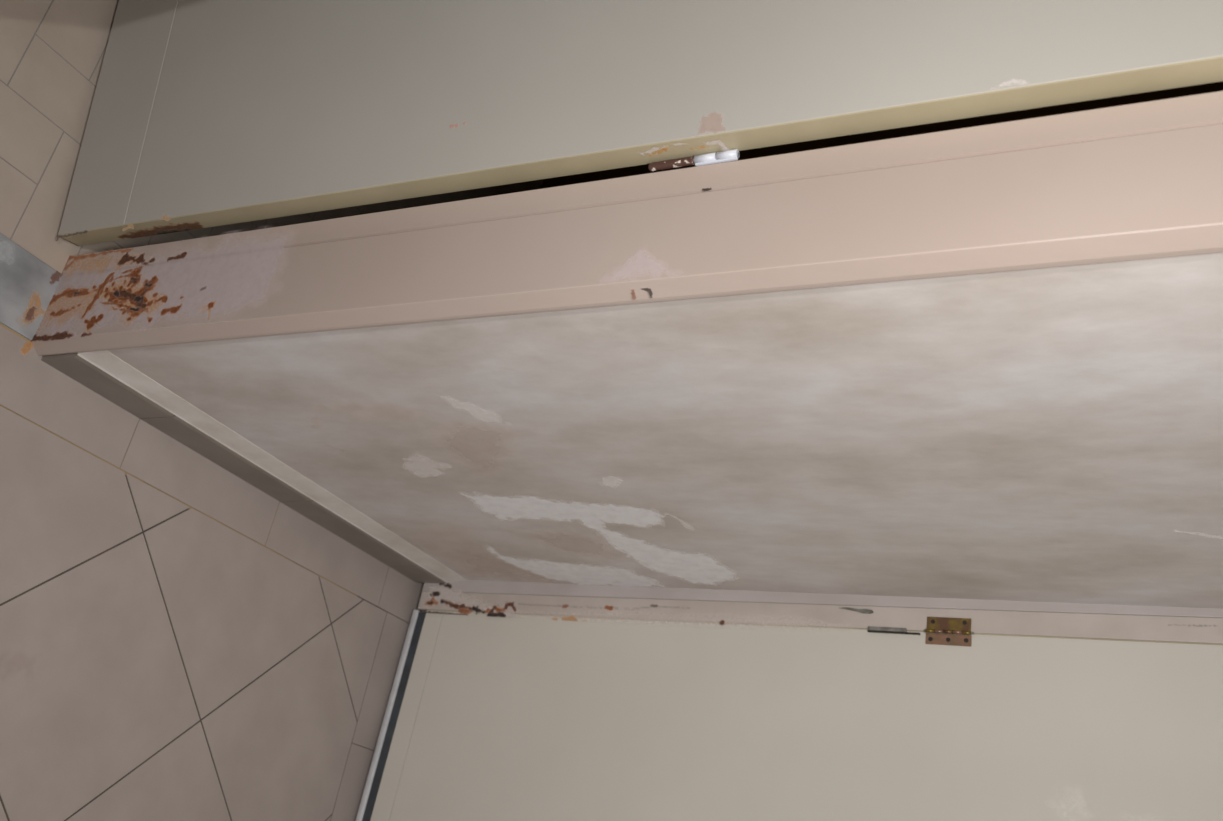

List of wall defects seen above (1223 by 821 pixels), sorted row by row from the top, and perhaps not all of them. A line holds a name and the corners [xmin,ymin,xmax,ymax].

rust [21,216,203,356]
flaking render [461,493,735,587]
rust [422,583,520,618]